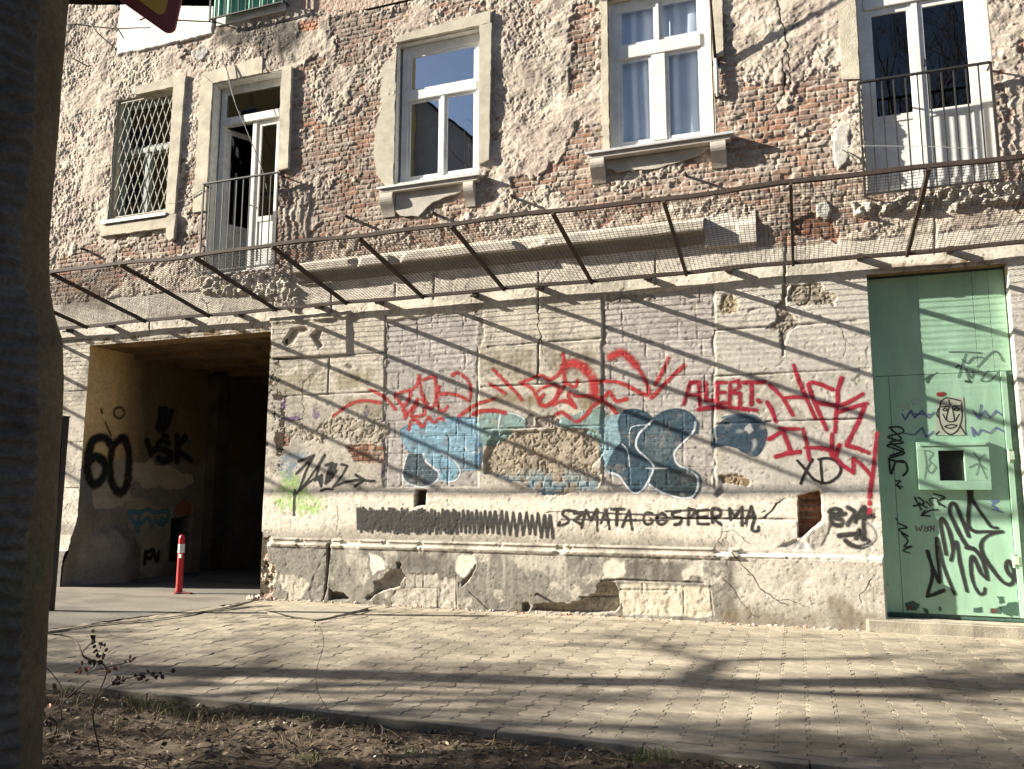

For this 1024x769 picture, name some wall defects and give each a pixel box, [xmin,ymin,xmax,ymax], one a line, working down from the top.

flaking render [297,18,320,33]
crack [763,0,799,124]
spalling [832,120,852,171]
flaking render [793,200,843,244]
spalling [850,179,1024,218]
flaking render [718,281,839,358]
flaking render [274,413,392,464]
flaking render [482,410,606,496]
spalling [776,484,833,561]
flaking render [259,533,478,609]
crack [718,526,809,616]